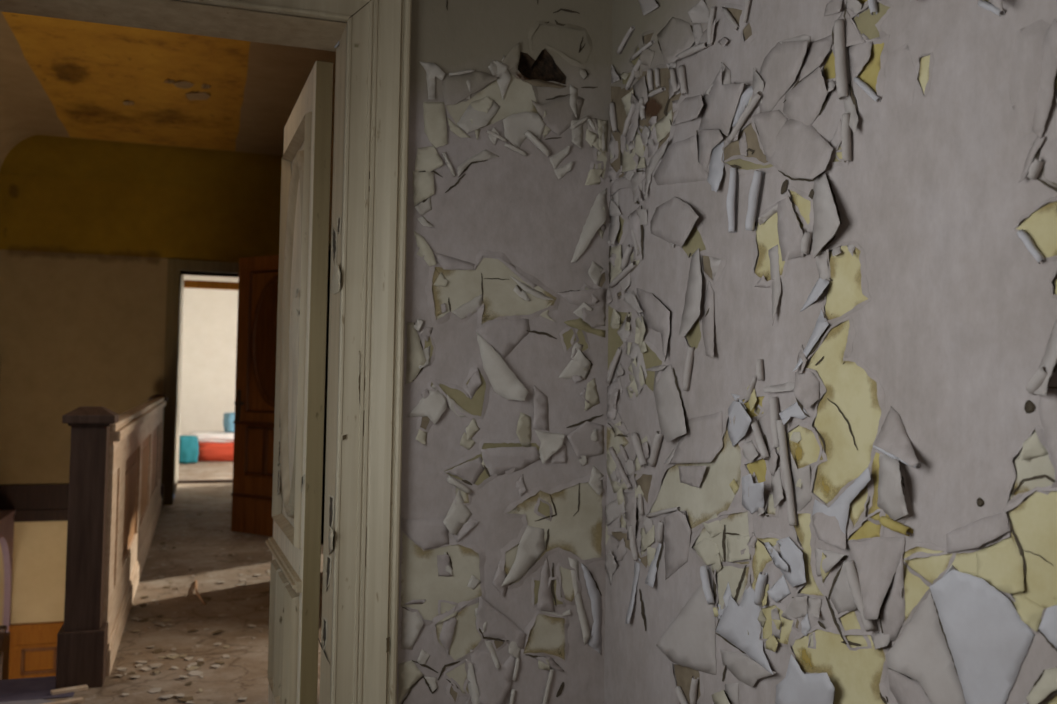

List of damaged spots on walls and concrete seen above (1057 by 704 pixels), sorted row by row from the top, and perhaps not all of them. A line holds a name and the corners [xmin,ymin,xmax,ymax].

peeling [1,11,251,151]